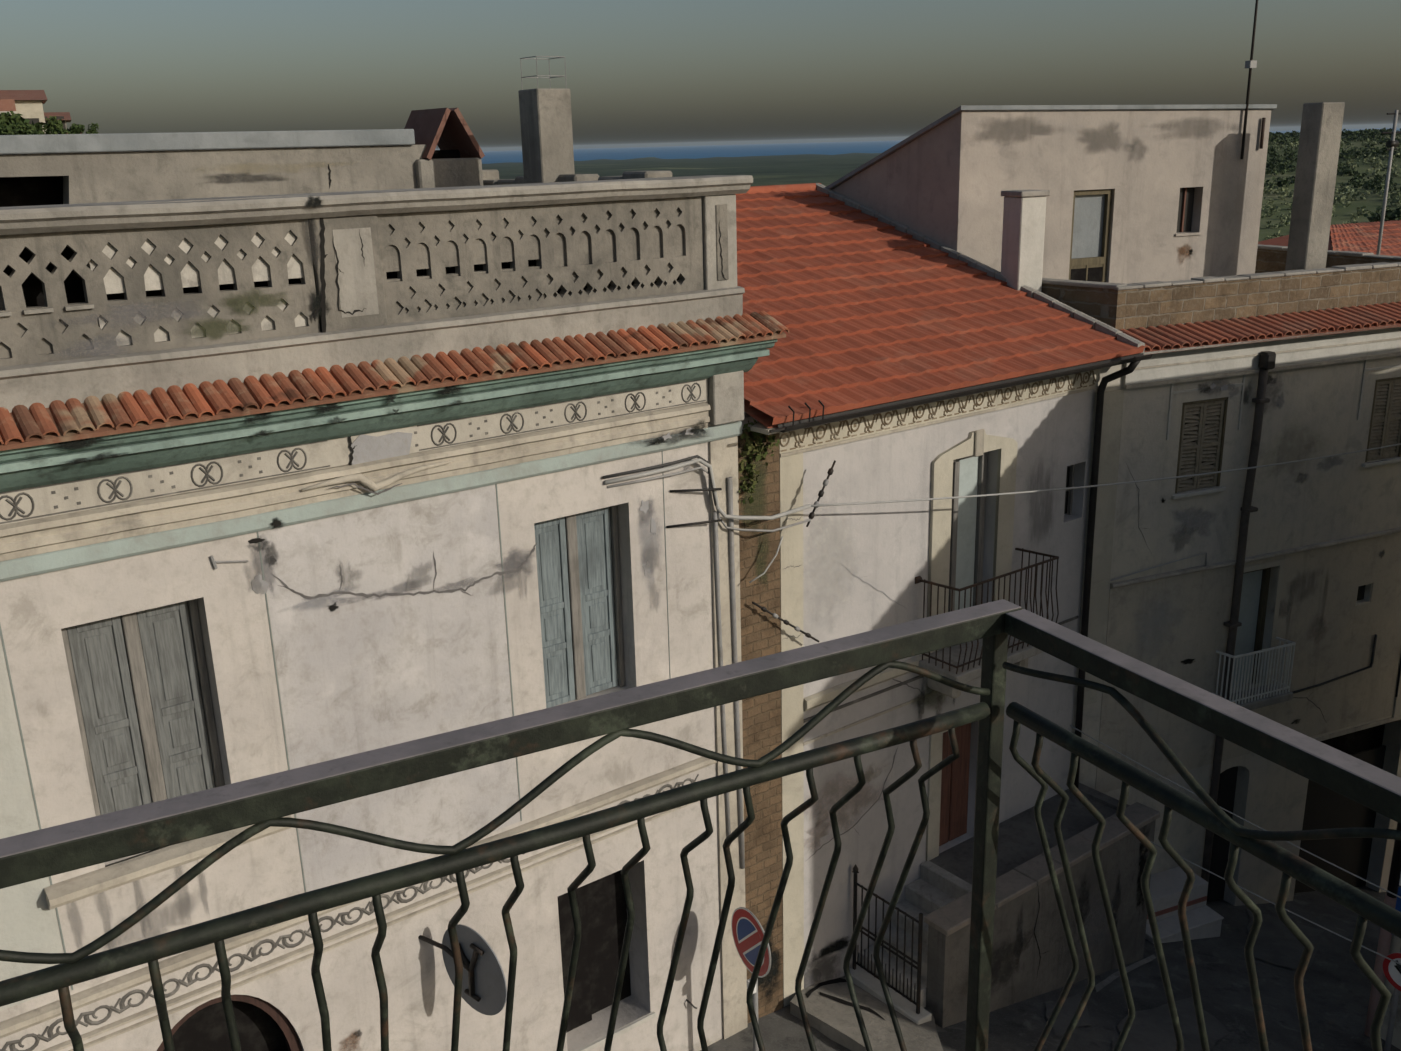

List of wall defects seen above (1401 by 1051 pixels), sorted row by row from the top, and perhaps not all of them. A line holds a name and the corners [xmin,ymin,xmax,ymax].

crack [306,164,366,333]
spalling [248,521,281,594]
crack [272,543,537,600]